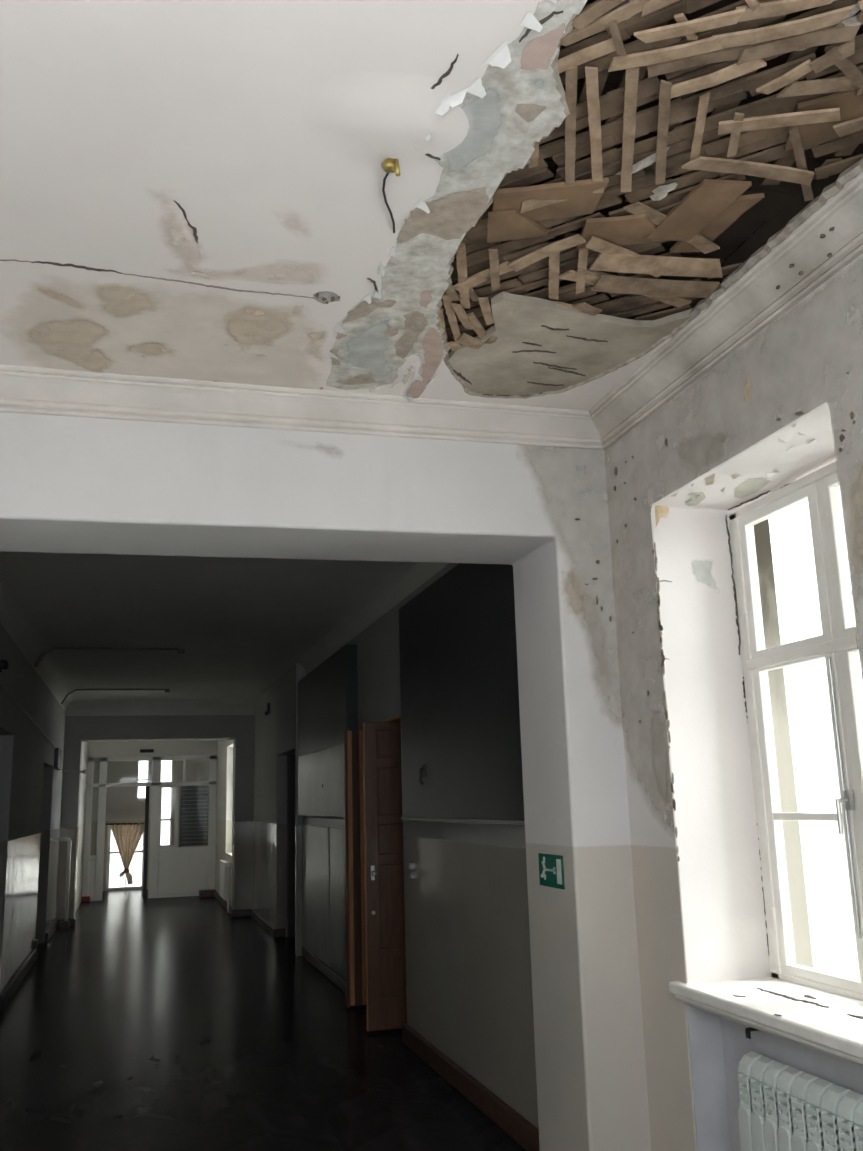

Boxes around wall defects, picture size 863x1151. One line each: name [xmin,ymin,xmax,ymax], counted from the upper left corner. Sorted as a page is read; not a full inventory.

crack [174,200,198,243]
flaking render [320,0,863,402]
crack [0,259,314,298]
spalling [313,291,340,304]
peeling [776,411,814,451]
peeling [838,411,856,452]
peeling [654,471,780,526]
spalling [652,542,665,675]
spalling [647,690,671,752]